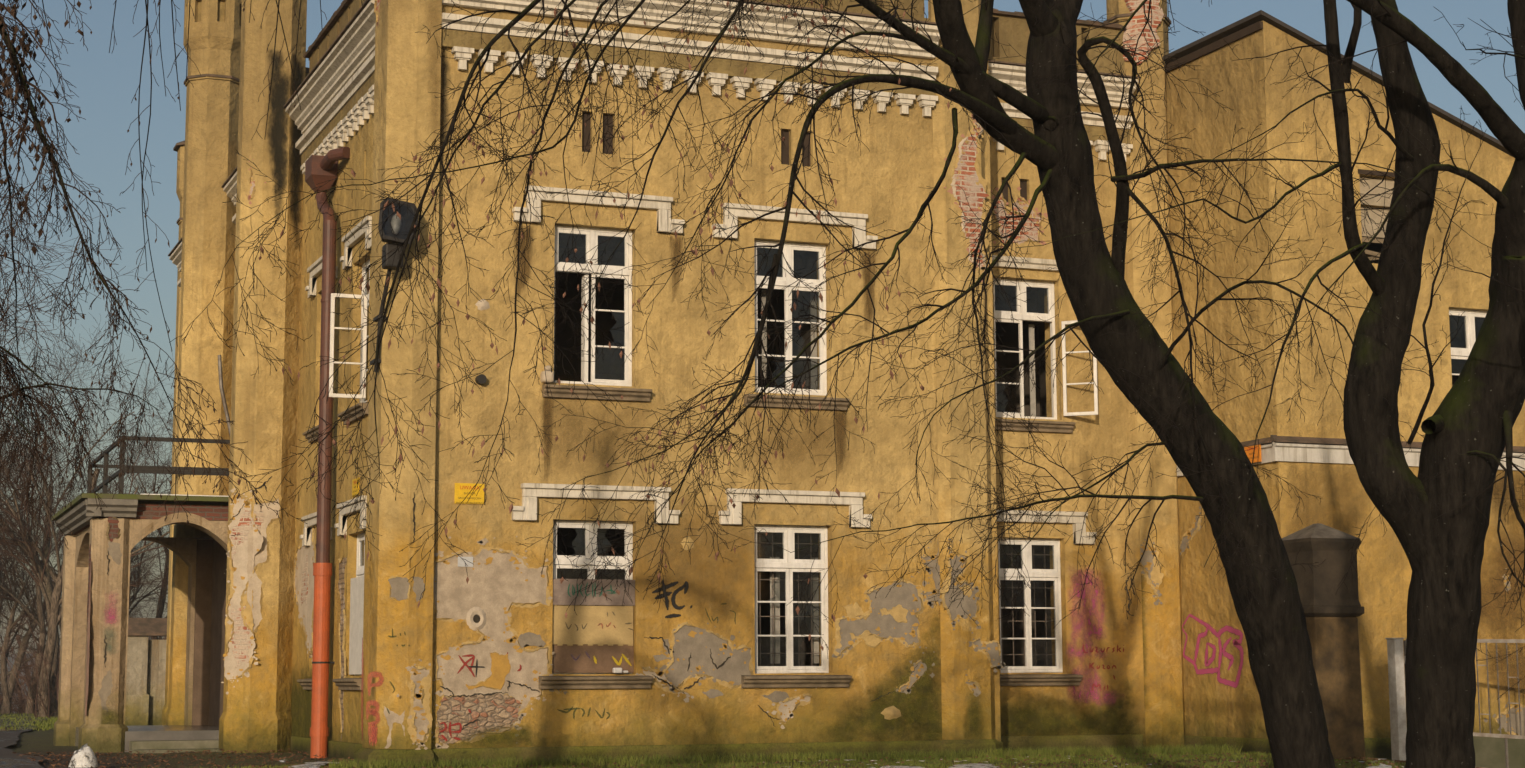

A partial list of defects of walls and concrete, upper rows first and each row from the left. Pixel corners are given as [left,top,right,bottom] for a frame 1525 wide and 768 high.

flaking render [1123,0,1164,65]
water stain [269,51,303,234]
flaking render [944,114,1048,282]
spalling [221,488,282,695]
spalling [384,536,568,750]
peeling [628,620,754,702]
peeling [762,687,817,729]
peeling [825,538,1005,697]